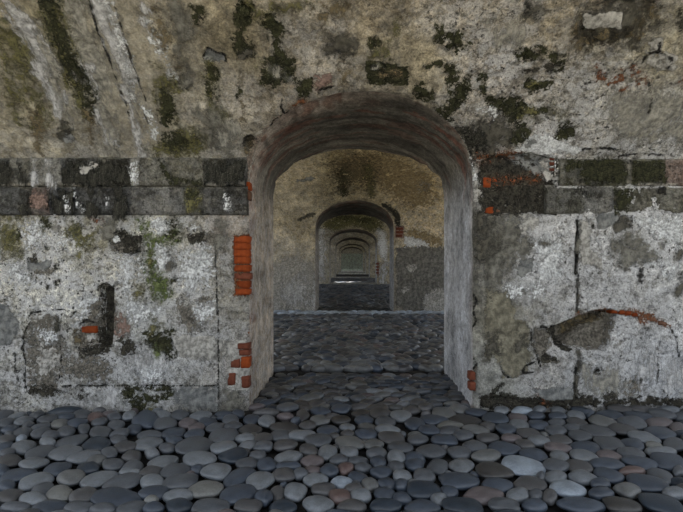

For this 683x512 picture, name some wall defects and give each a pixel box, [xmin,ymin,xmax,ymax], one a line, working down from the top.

crack [89,0,149,124]
water stain [0,0,159,289]
flaking render [28,299,136,397]
water stain [71,293,102,333]
flaking render [467,149,683,410]
crack [574,220,582,312]